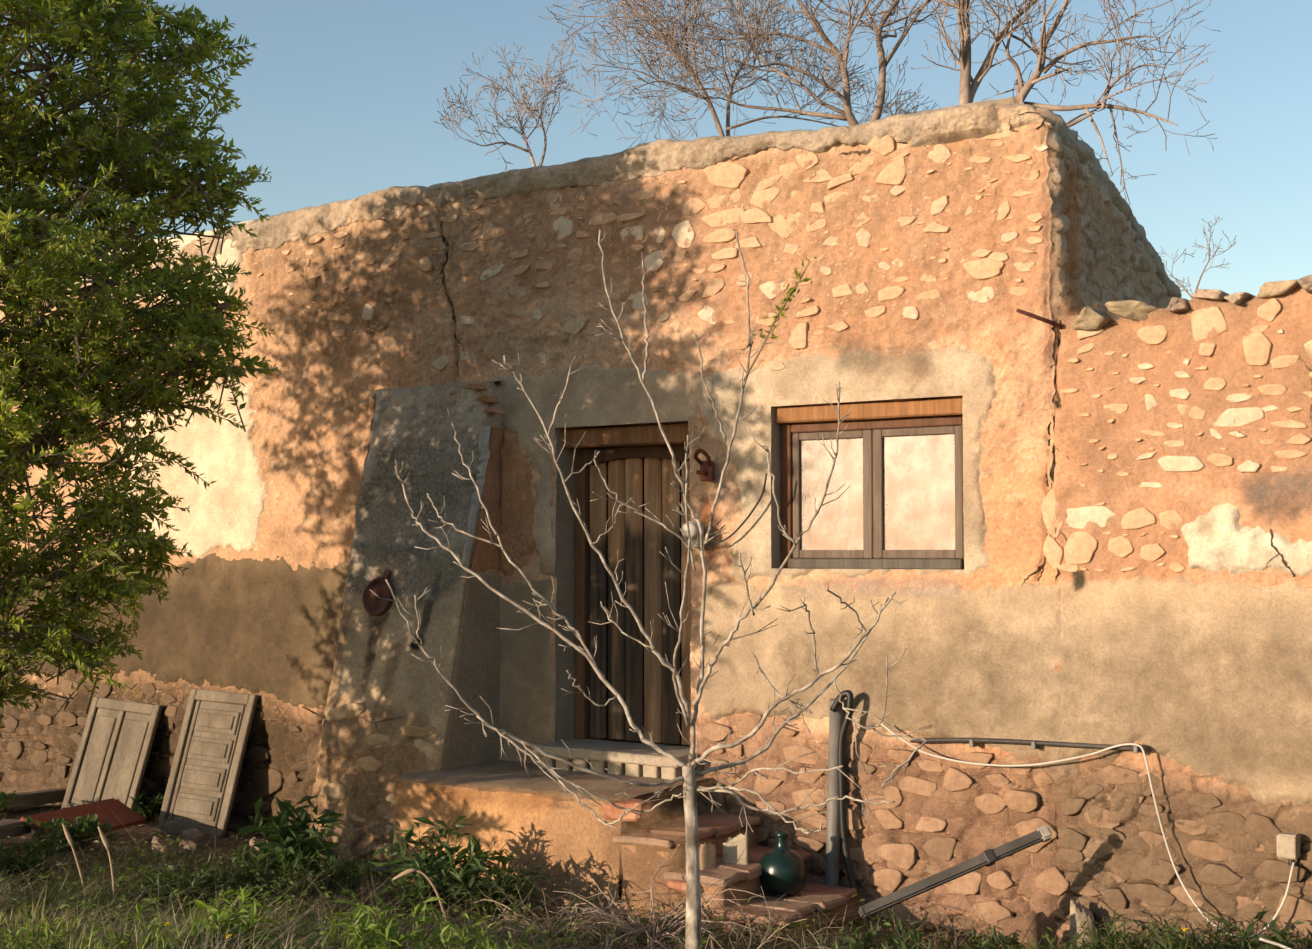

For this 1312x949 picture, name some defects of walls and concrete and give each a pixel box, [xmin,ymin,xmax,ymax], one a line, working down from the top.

crack [433,221,465,376]
crack [1046,319,1068,491]
flaking render [462,426,535,576]
crack [1021,531,1067,587]
crack [1266,529,1295,577]
spalling [0,669,191,800]
spalling [700,714,1312,949]